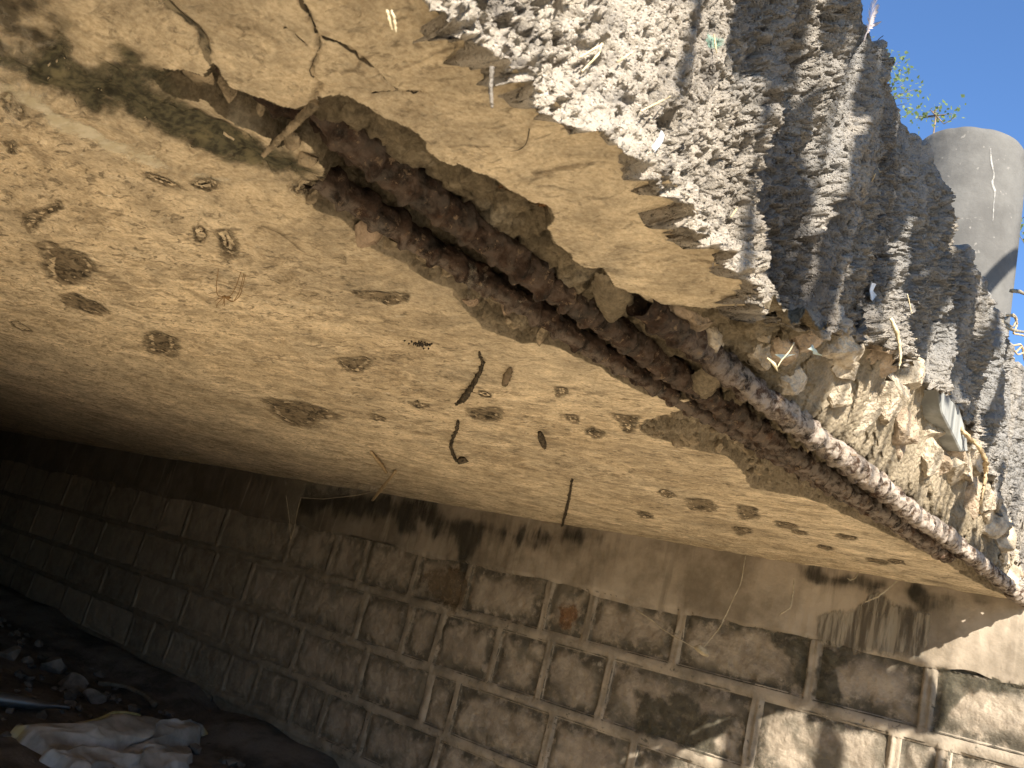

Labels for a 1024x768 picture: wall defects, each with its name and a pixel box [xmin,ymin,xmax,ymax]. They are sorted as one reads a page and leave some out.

crack [163,0,211,66]
crack [283,0,422,94]
spalling [142,63,1024,608]
water stain [299,485,548,612]
water stain [806,565,934,659]